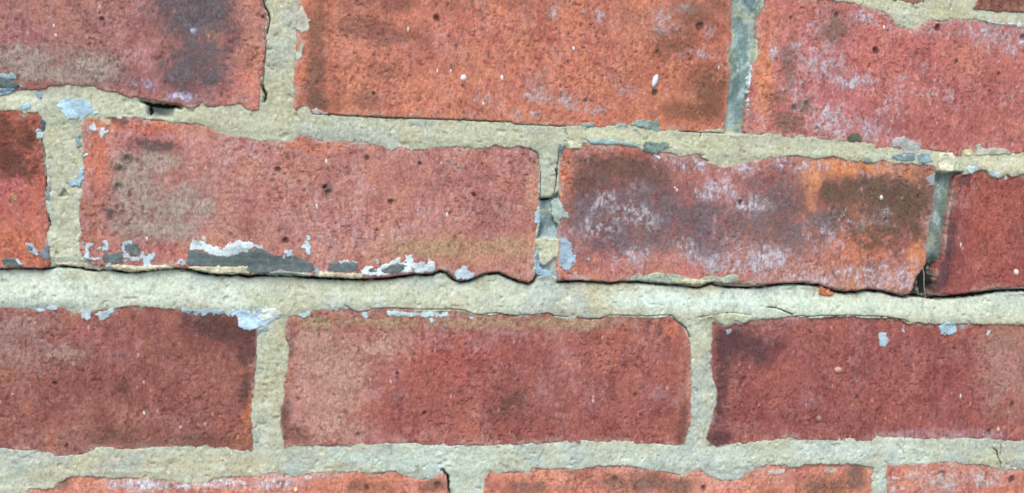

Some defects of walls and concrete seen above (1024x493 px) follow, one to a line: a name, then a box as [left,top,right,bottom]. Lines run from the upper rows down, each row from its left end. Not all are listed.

peeling [2,235,435,279]
peeling [455,265,475,281]
crack [0,265,1024,337]
peeling [533,197,591,278]
water stain [566,152,934,289]